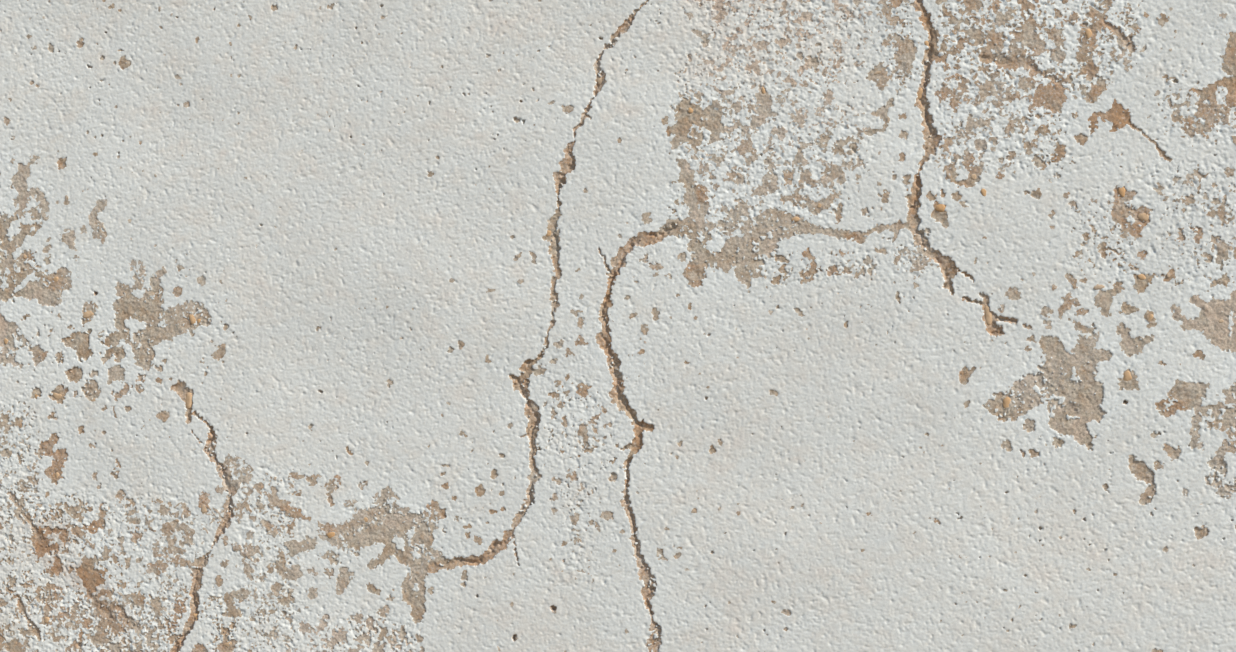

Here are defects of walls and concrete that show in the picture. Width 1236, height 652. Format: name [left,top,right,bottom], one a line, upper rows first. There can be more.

crack [170,380,237,652]
peeling [0,155,483,652]
crack [427,0,649,573]
peeling [533,294,619,562]
crack [596,223,678,652]
peeling [626,0,1170,302]
peeling [958,366,976,385]
crack [905,0,1033,337]
peeling [1001,440,1039,458]
peeling [964,164,1236,451]
peeling [1129,379,1236,505]
peeling [1154,32,1236,147]